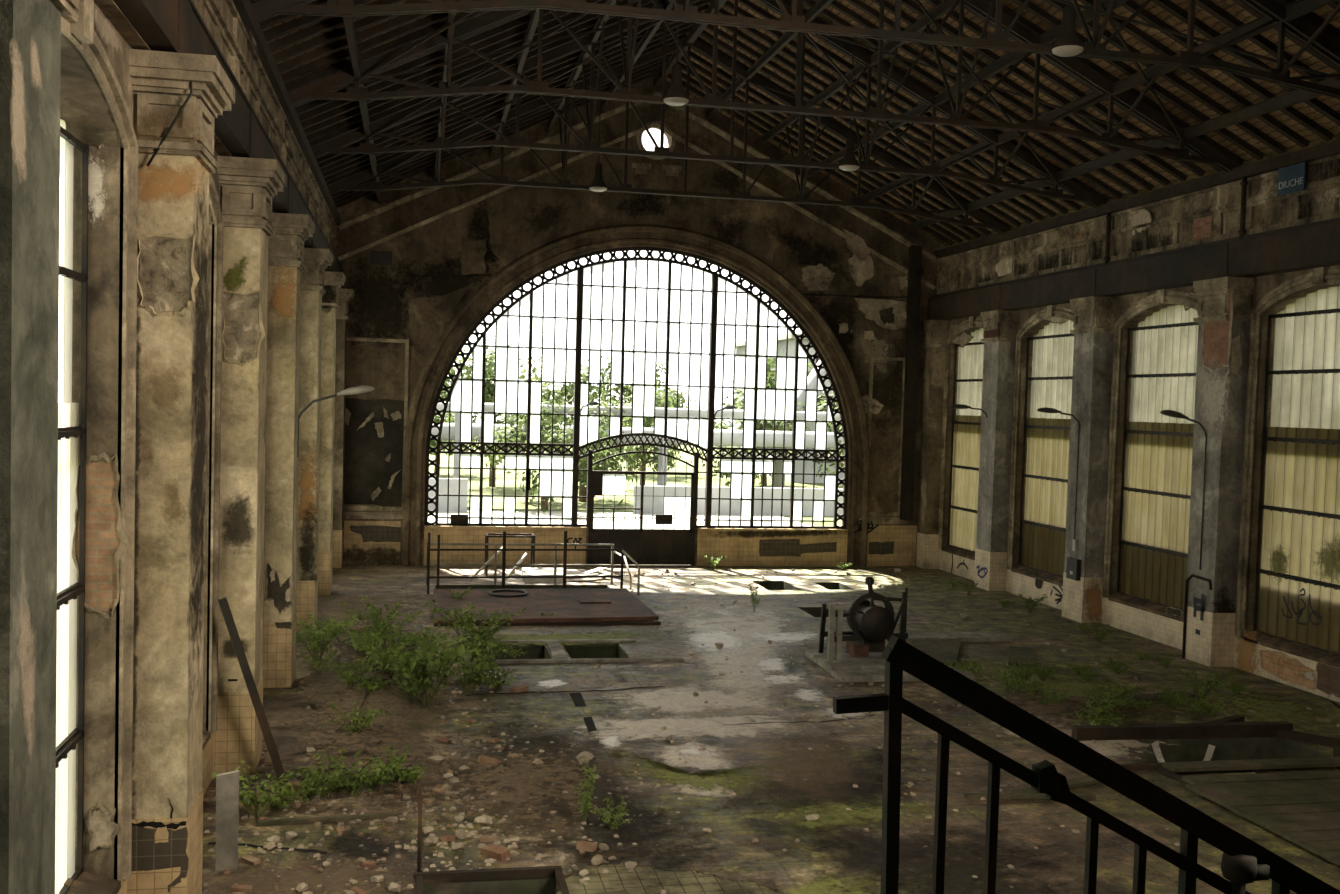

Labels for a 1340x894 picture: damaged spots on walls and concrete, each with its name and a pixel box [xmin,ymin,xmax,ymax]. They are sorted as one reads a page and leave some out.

flaking render [1184,290,1243,378]
flaking render [72,452,128,619]
leakage [223,498,251,546]
peeling [264,562,293,629]
leakage [224,640,246,657]
peeling [85,802,189,893]